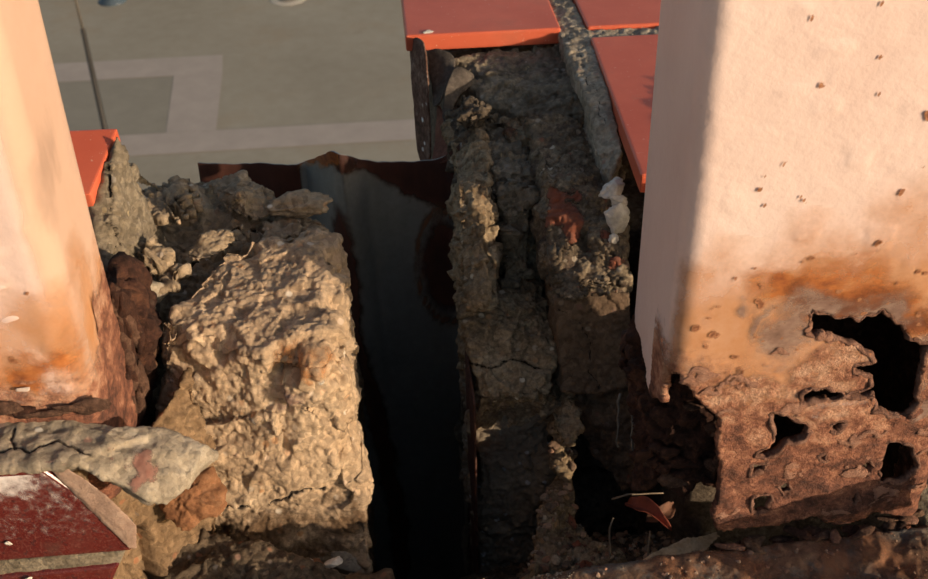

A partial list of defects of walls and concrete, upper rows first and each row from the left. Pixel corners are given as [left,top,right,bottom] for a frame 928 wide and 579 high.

rust [0,0,163,427]
rust [198,143,460,209]
rust [421,220,456,311]
crack [0,428,91,457]
rust [88,472,122,499]
rust [618,216,928,579]